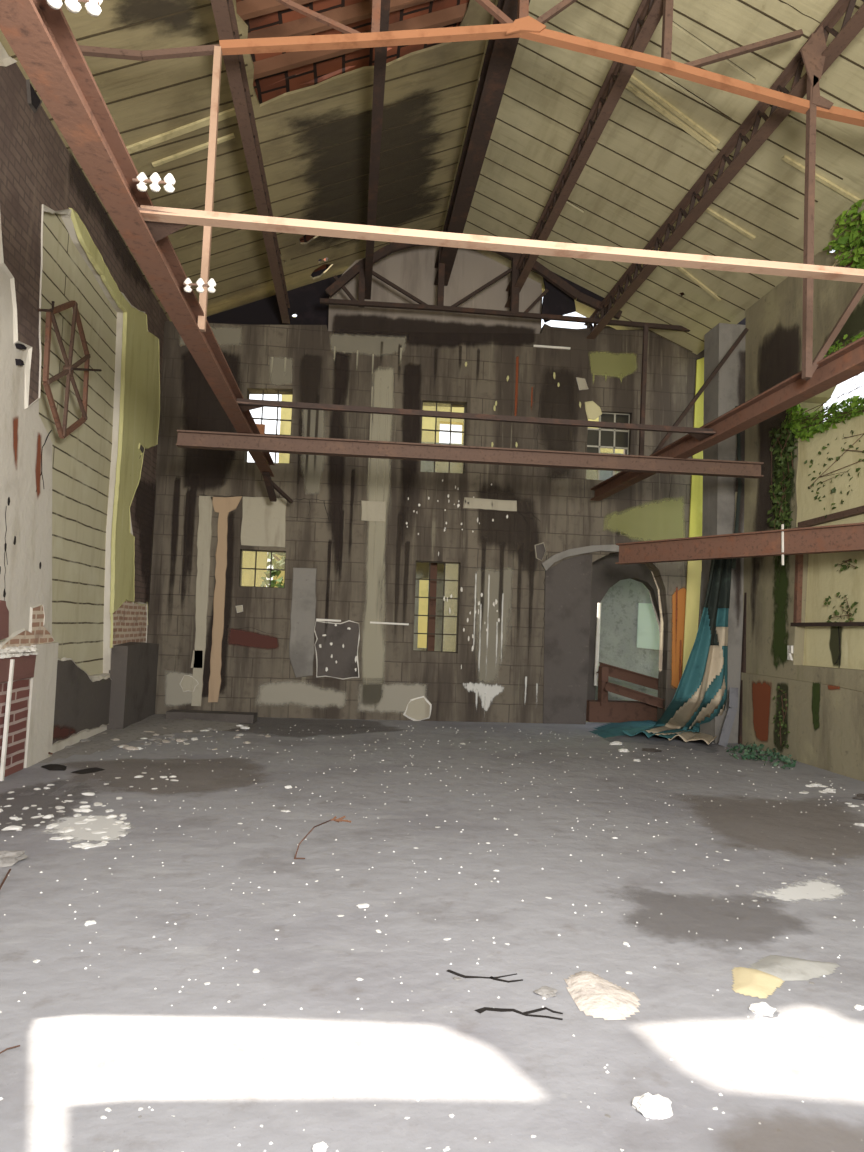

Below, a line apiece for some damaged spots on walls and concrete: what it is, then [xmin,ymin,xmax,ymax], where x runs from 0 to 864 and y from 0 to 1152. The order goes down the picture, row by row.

damp [119,0,202,31]
spalling [0,56,169,653]
damp [180,336,236,433]
damp [211,327,241,387]
damp [270,314,535,443]
damp [169,448,235,602]
damp [298,454,426,712]
damp [463,486,539,711]
flaking render [796,412,864,527]